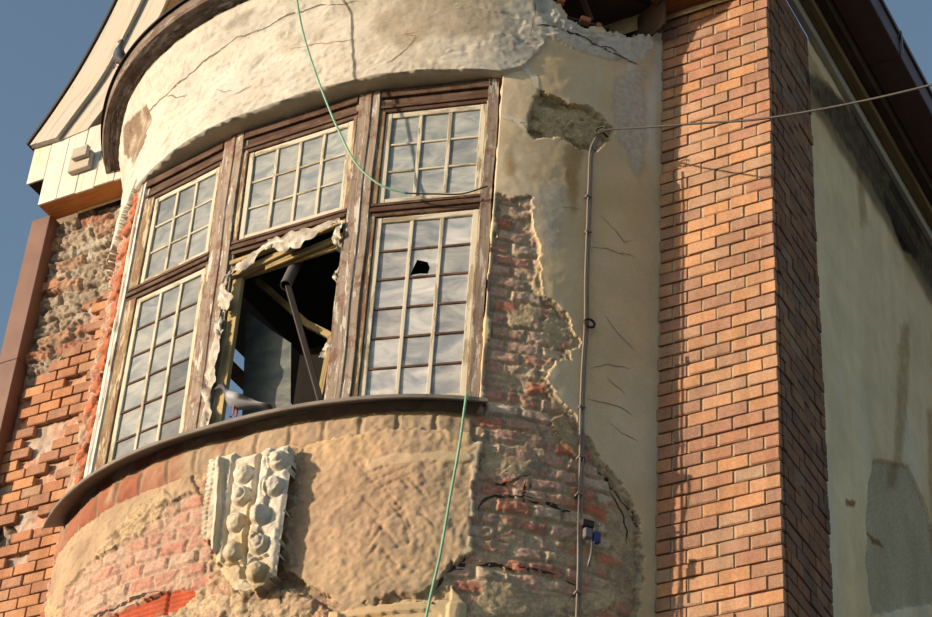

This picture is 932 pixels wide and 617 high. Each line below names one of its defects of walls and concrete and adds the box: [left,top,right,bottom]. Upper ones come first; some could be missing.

crack [148,0,356,114]
crack [388,31,419,63]
spalling [557,0,610,32]
peeling [123,103,152,164]
spalling [527,90,616,153]
spalling [19,180,139,494]
spalling [449,192,646,617]
crack [588,317,637,441]
spalling [0,526,18,548]
spalling [40,447,332,617]
crack [597,471,639,544]